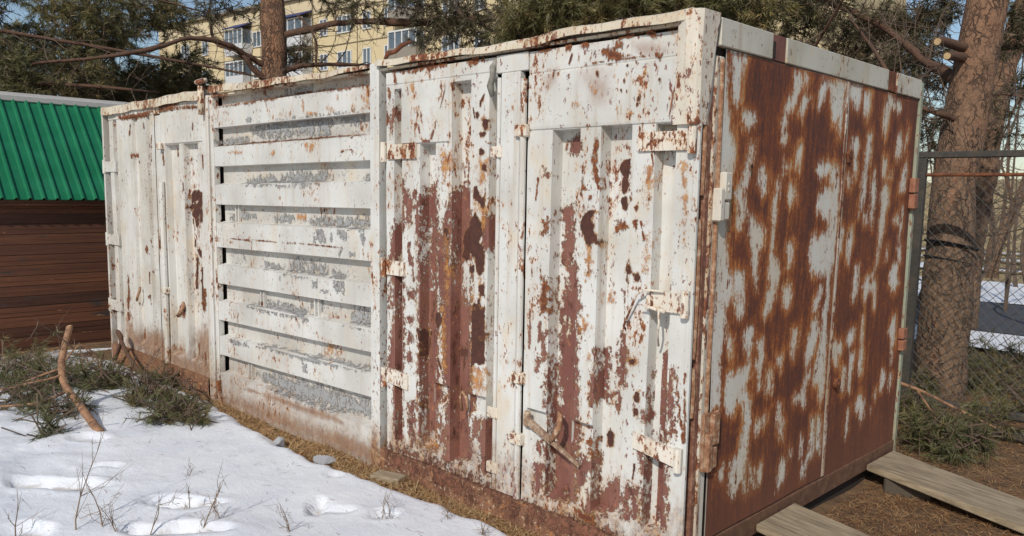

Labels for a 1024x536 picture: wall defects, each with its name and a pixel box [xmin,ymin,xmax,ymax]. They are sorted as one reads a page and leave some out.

rust [537,29,663,101]
rust [118,102,198,139]
peeling [214,111,370,146]
rust [182,183,207,313]
peeling [240,169,333,189]
peeling [248,213,371,327]
peeling [342,305,371,332]
rust [417,94,496,395]
rust [580,137,670,284]
rust [705,50,919,536]
peeling [229,338,371,419]
rust [577,424,615,458]